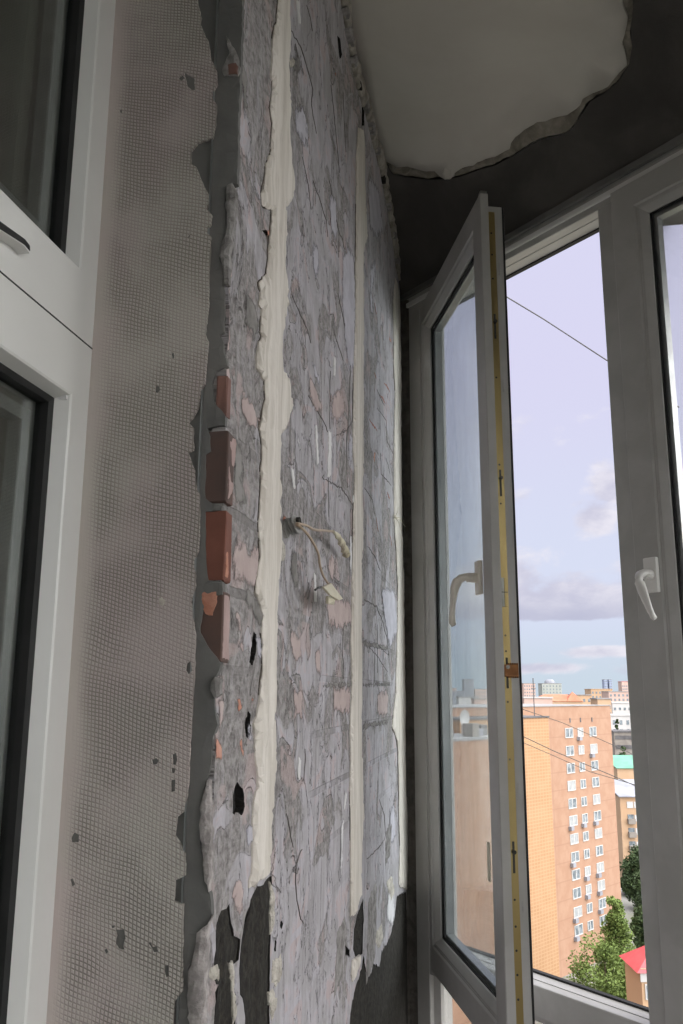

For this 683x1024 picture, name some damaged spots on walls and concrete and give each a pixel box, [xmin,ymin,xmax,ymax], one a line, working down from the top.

crack [291,5,355,276]
peeling [376,0,633,184]
crack [292,295,353,455]
crack [322,390,394,514]
crack [364,599,389,679]
crack [286,813,304,924]
flaking render [214,877,270,1024]
flaking render [334,880,408,1024]